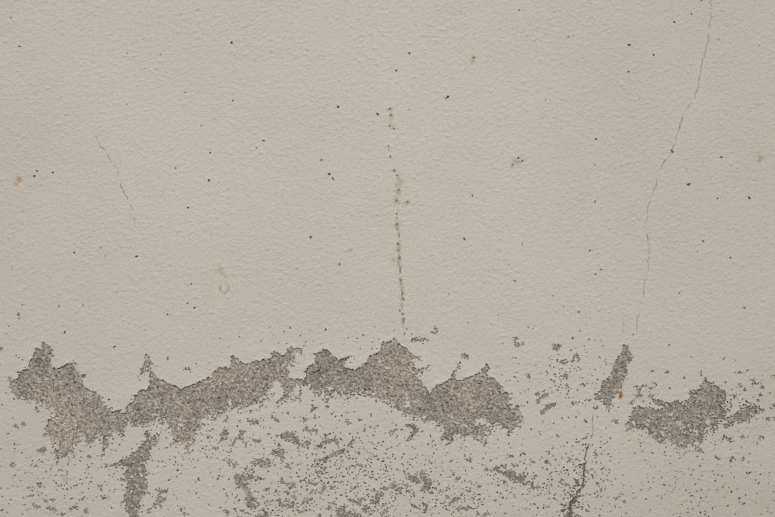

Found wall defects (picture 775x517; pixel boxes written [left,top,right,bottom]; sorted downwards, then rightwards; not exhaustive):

crack [387,108,409,335]
crack [636,2,712,331]
peeling [8,326,524,517]
peeling [550,353,580,388]
crack [560,412,594,517]
peeling [588,344,775,456]